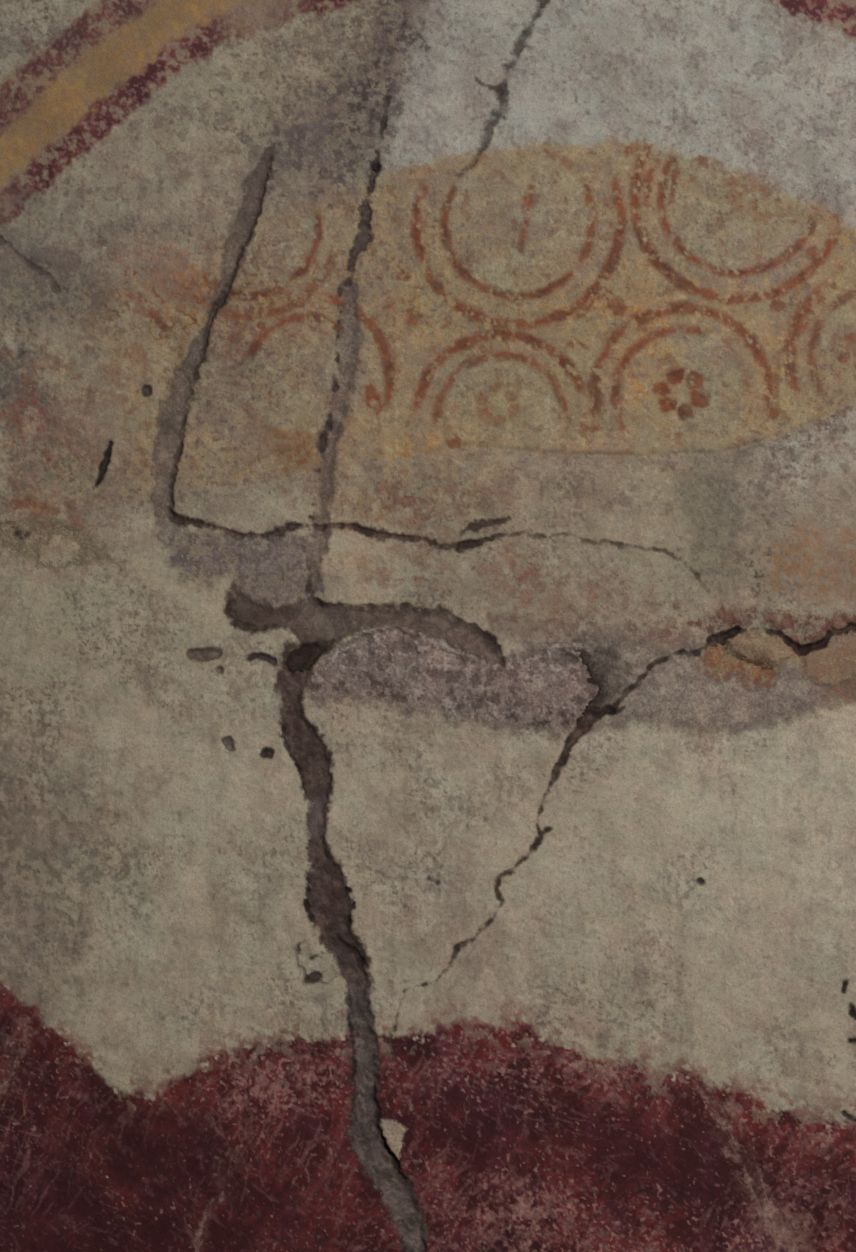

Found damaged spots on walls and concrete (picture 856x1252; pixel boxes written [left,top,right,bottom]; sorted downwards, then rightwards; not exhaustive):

crack [459,0,549,175]
crack [150,90,856,1252]